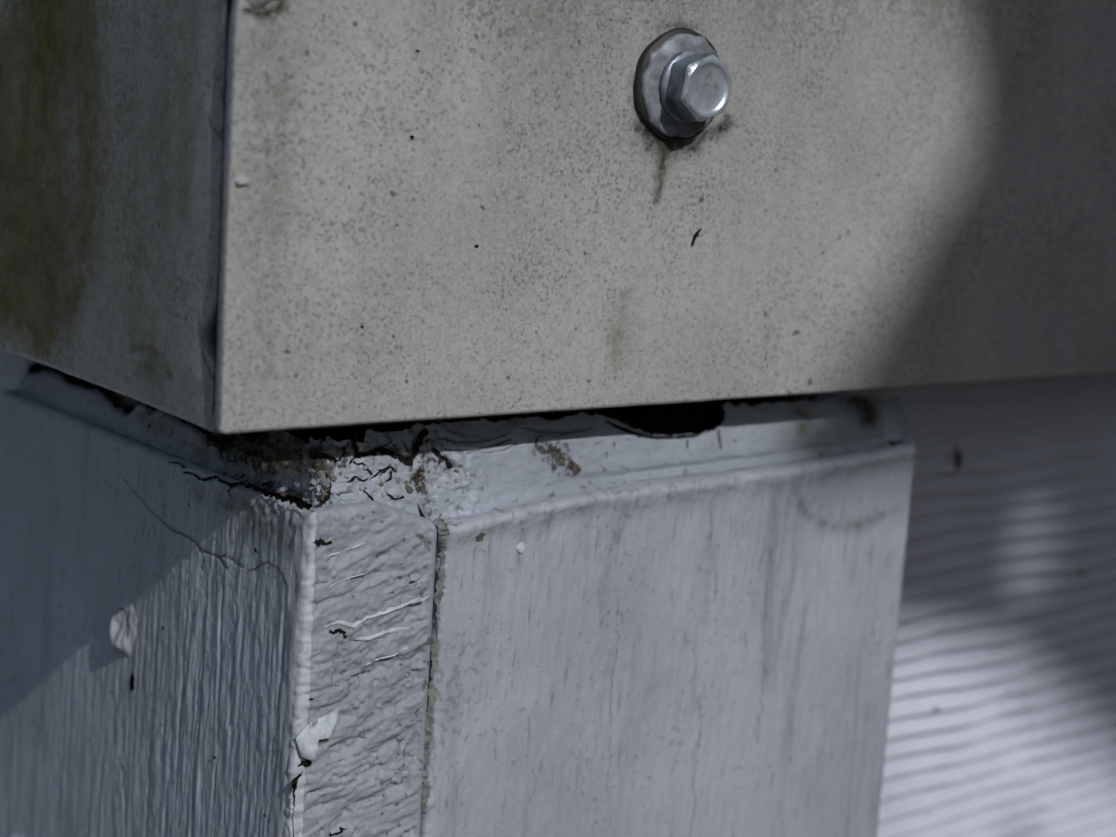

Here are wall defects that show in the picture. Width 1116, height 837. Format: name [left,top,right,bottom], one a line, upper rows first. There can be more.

crack [122,478,304,837]
peeling [308,452,459,504]